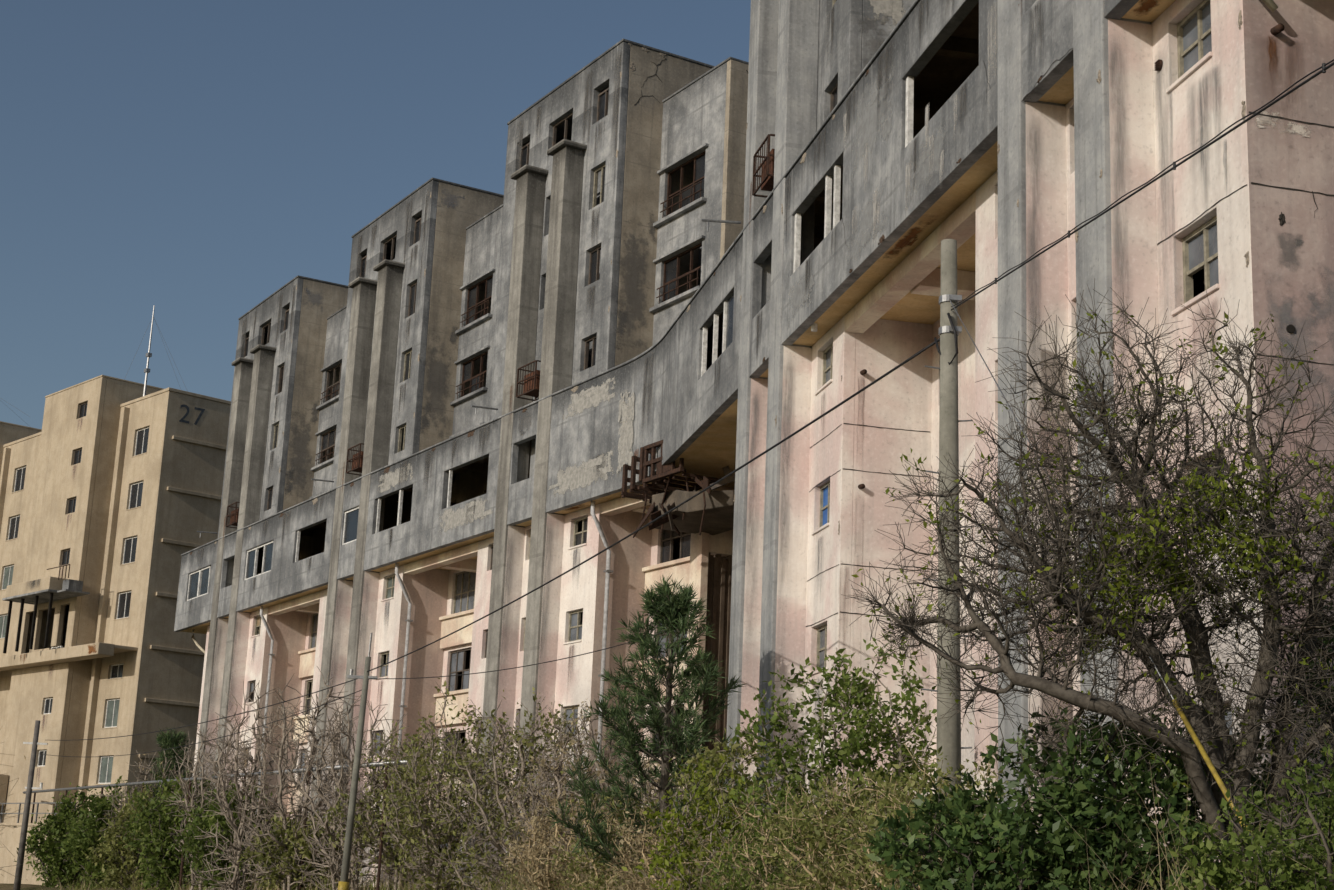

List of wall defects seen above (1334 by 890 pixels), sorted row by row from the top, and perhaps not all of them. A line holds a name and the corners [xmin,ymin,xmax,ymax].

peeling [867,0,905,25]
crack [635,59,666,105]
peeling [548,377,635,497]